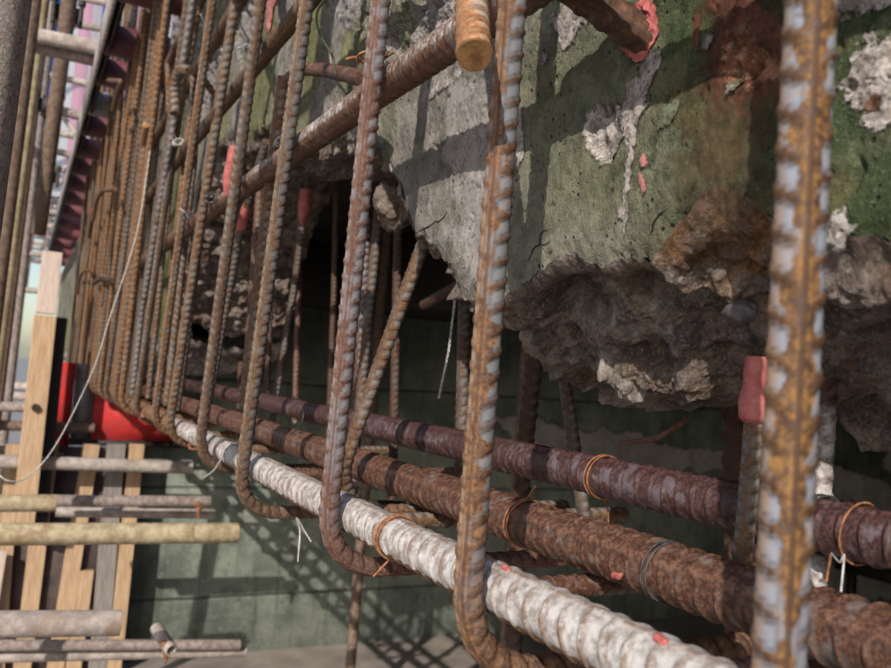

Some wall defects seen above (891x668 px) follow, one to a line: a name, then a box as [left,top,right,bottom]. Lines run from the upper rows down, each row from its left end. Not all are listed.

corrosion [693,0,783,113]
spalling [837,31,891,133]
leakage [677,66,780,217]
spalling [214,384,242,409]
spalling [361,446,389,455]
spalling [389,329,401,418]
peeling [534,417,568,450]
peeling [579,427,723,474]
spalling [588,457,739,532]
spalling [832,465,891,569]